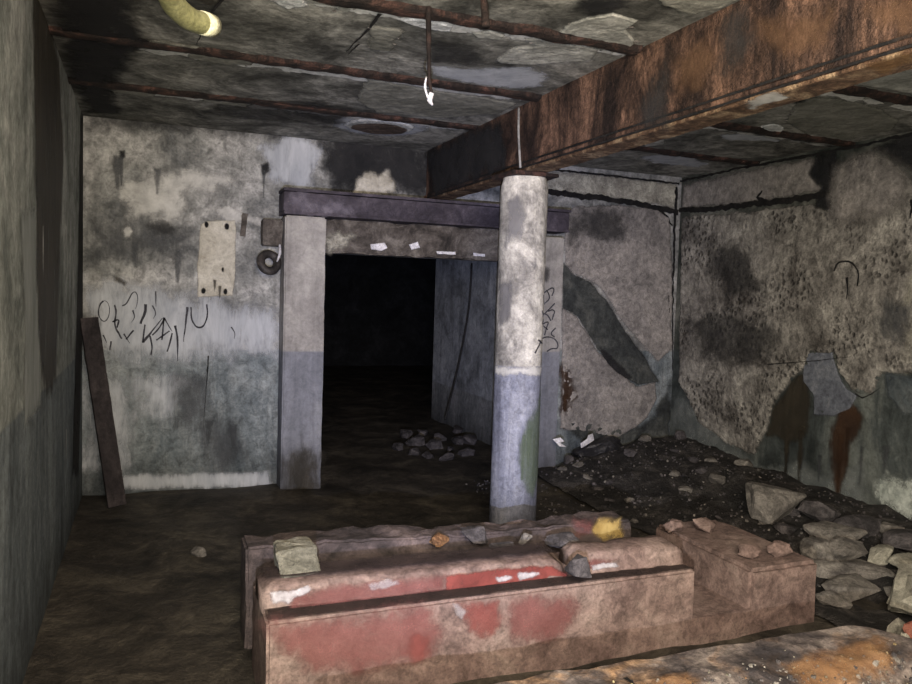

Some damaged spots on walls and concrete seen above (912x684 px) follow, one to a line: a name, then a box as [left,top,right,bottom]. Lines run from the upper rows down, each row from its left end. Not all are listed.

peeling [272,0,640,65]
peeling [659,0,737,15]
peeling [111,90,255,107]
peeling [139,40,516,130]
corrosion [749,92,787,109]
damp [114,151,125,188]
peeling [354,171,395,193]
damp [92,223,185,279]
crack [548,132,912,371]
spalling [547,152,912,454]
corrosion [559,367,577,412]
corrosion [829,406,862,493]